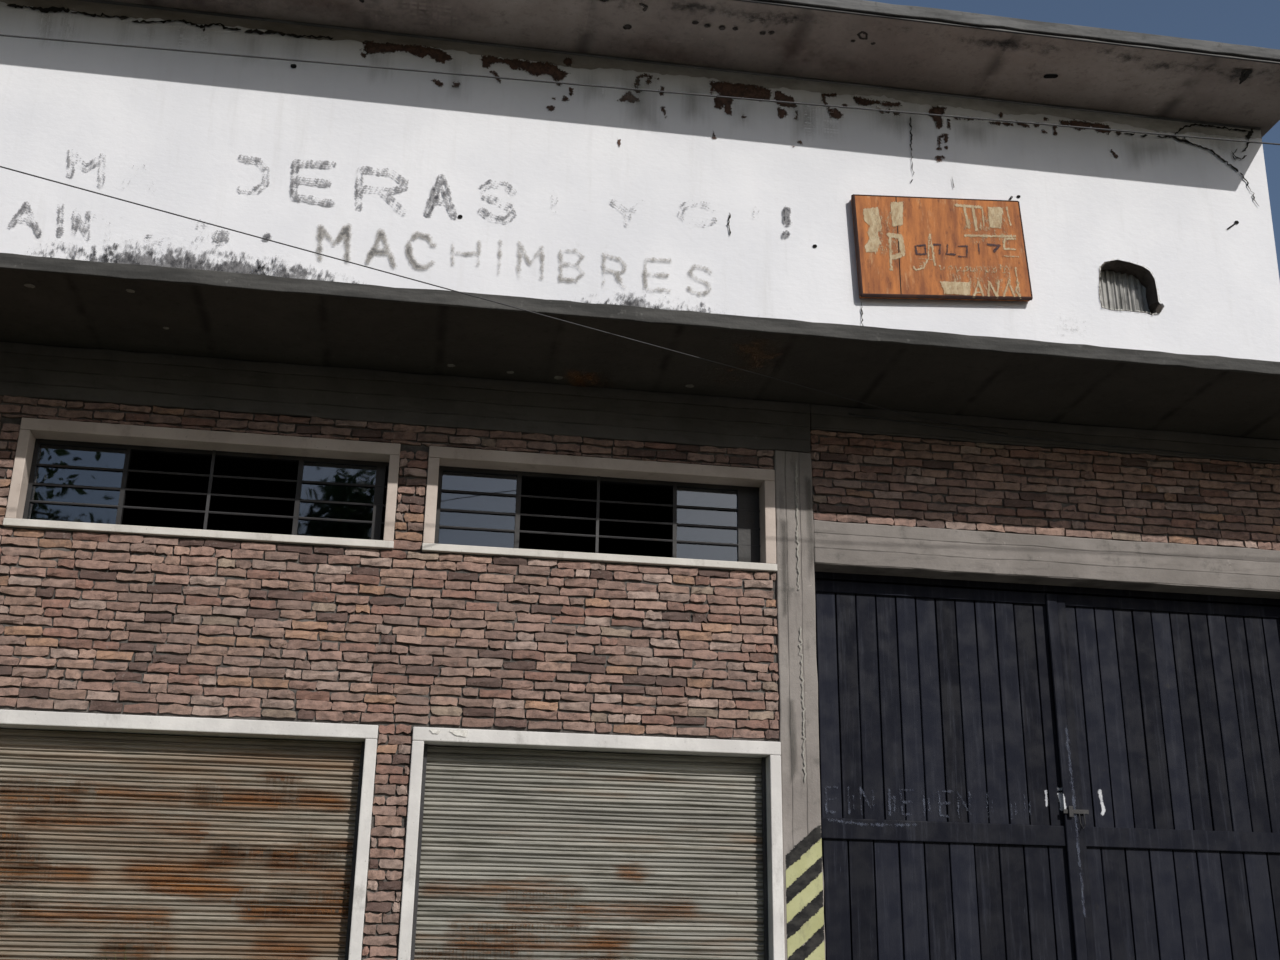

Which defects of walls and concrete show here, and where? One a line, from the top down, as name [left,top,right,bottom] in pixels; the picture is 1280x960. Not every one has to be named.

peeling [360,40,452,64]
peeling [481,55,574,111]
peeling [617,73,667,118]
peeling [710,80,798,119]
peeling [821,92,900,119]
crack [1239,70,1253,84]
crack [1124,123,1259,206]
water stain [43,240,334,282]
water stain [583,293,710,313]
corrosion [0,786,178,880]
corrosion [128,839,352,921]
corrosion [0,899,166,925]